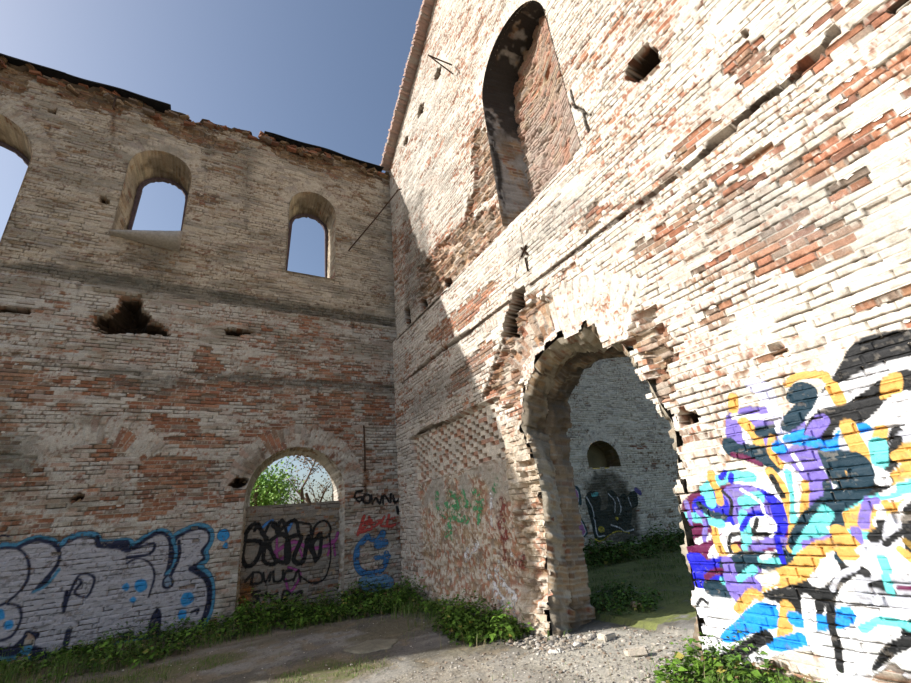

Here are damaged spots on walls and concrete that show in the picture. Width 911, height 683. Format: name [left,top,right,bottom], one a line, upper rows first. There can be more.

peeling [721,0,861,88]
peeling [783,0,897,80]
spalling [92,294,171,337]
spalling [618,304,681,404]